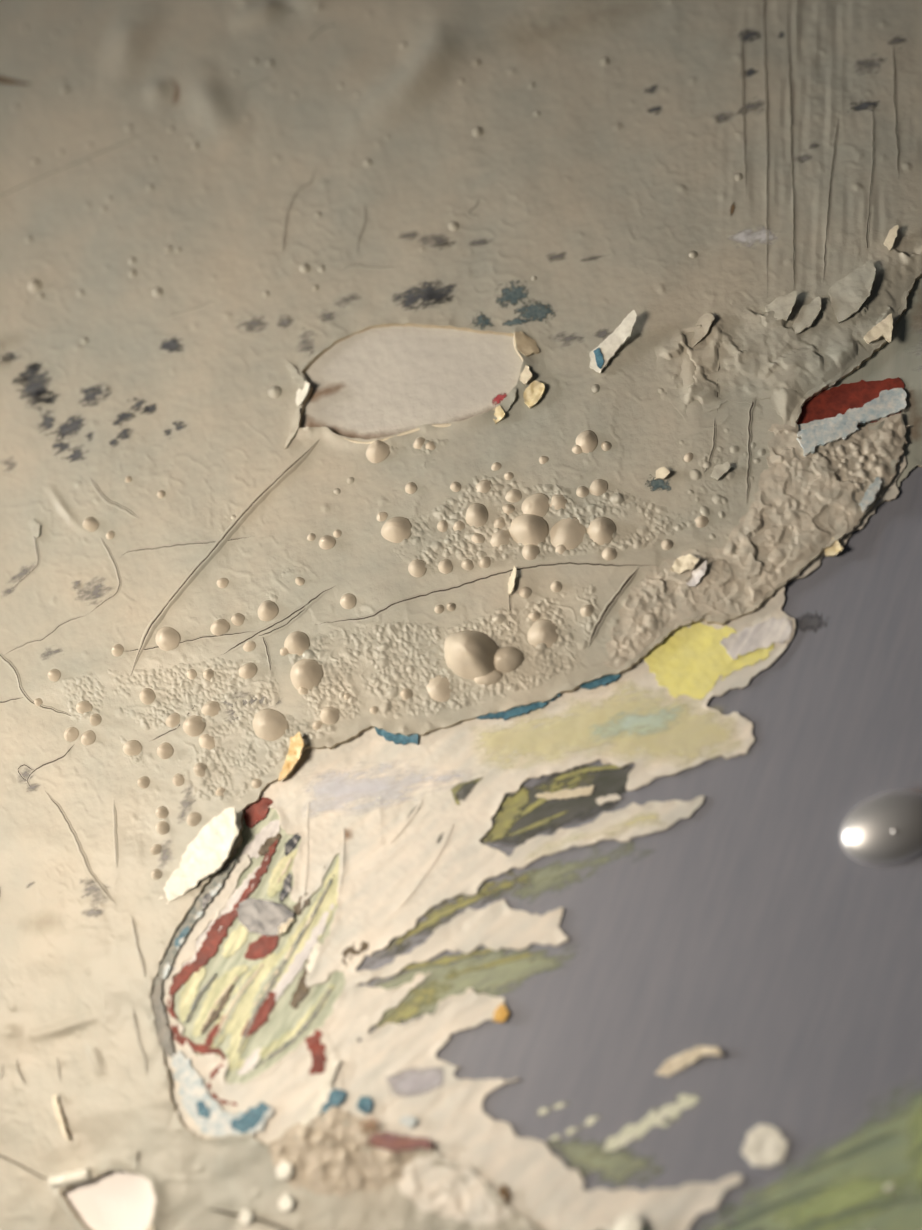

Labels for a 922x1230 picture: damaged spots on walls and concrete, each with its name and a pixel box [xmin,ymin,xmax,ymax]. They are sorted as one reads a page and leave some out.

crack [0,439,659,978]
peeling [147,225,922,1230]
crack [0,1058,26,1084]
crack [55,1056,63,1081]
crack [133,1007,148,1078]
peeling [49,1150,155,1230]